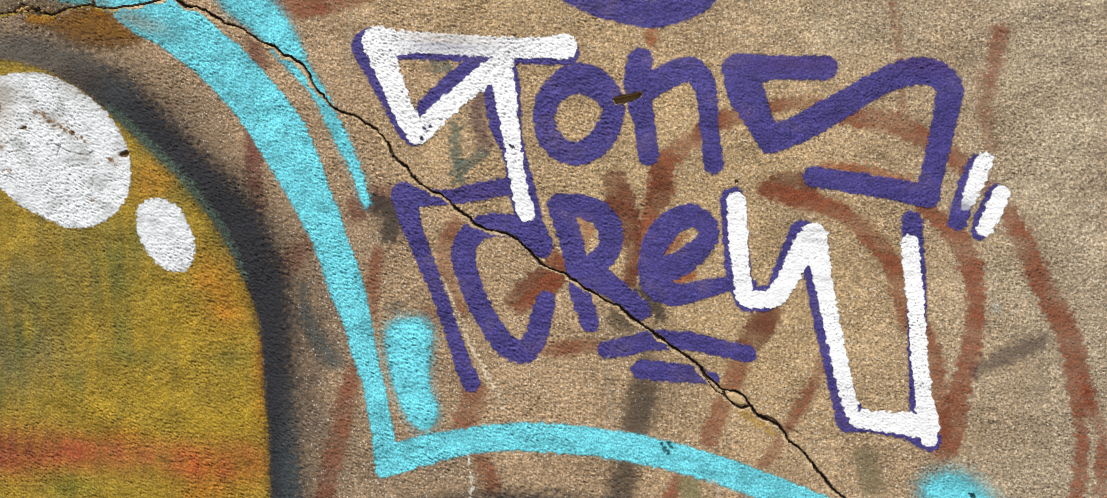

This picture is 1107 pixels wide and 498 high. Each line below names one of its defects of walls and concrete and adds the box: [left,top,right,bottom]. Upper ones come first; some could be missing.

crack [0,0,846,498]